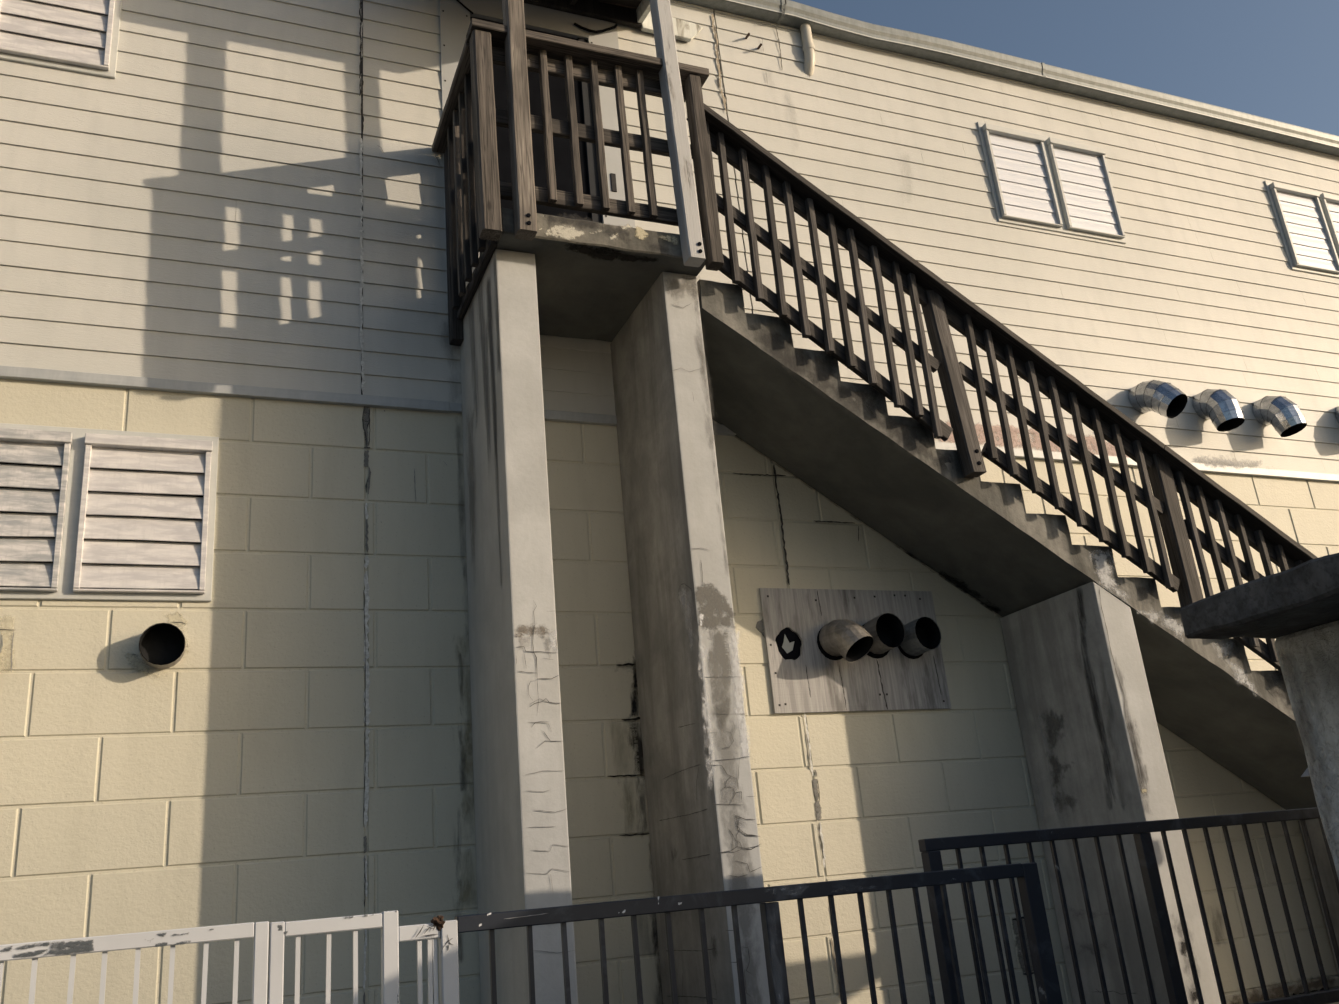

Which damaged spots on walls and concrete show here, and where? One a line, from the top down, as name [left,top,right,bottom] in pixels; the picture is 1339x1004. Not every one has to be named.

crack [359,0,384,153]
peeling [539,215,678,245]
crack [734,465,790,585]
crack [815,521,859,541]
crack [363,571,371,1004]
crack [516,602,570,889]
leakage [608,662,644,777]
crack [659,713,763,904]
leakage [692,548,749,756]